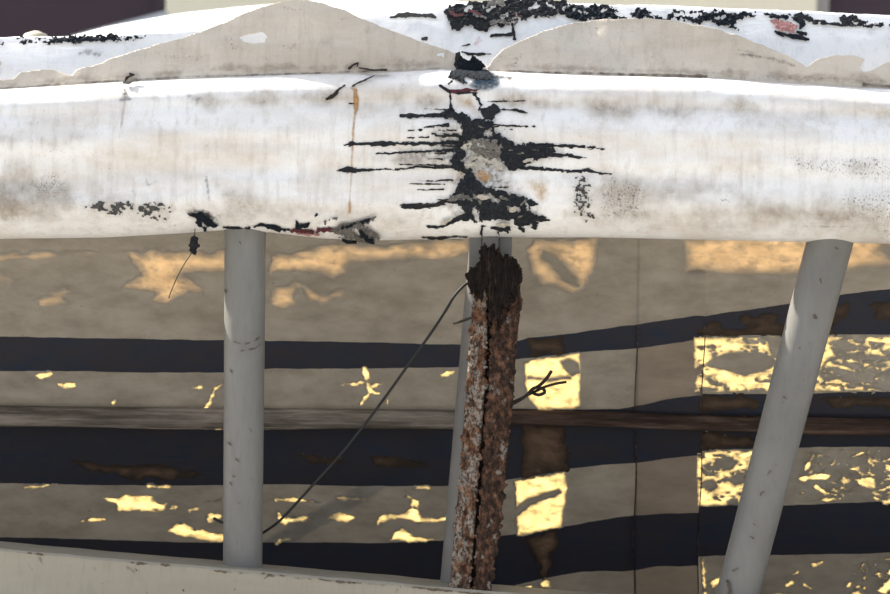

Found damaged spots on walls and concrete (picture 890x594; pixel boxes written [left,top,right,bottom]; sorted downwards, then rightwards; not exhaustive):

peeling [16,33,146,45]
peeling [390,0,890,41]
peeling [439,44,492,95]
peeling [119,248,224,305]
peeling [693,312,785,414]
peeling [814,301,890,411]
peeling [71,459,223,543]
peeling [696,431,755,507]
peeling [798,448,890,506]
peeling [700,557,720,594]
peeling [773,570,812,594]
peeling [844,557,890,594]